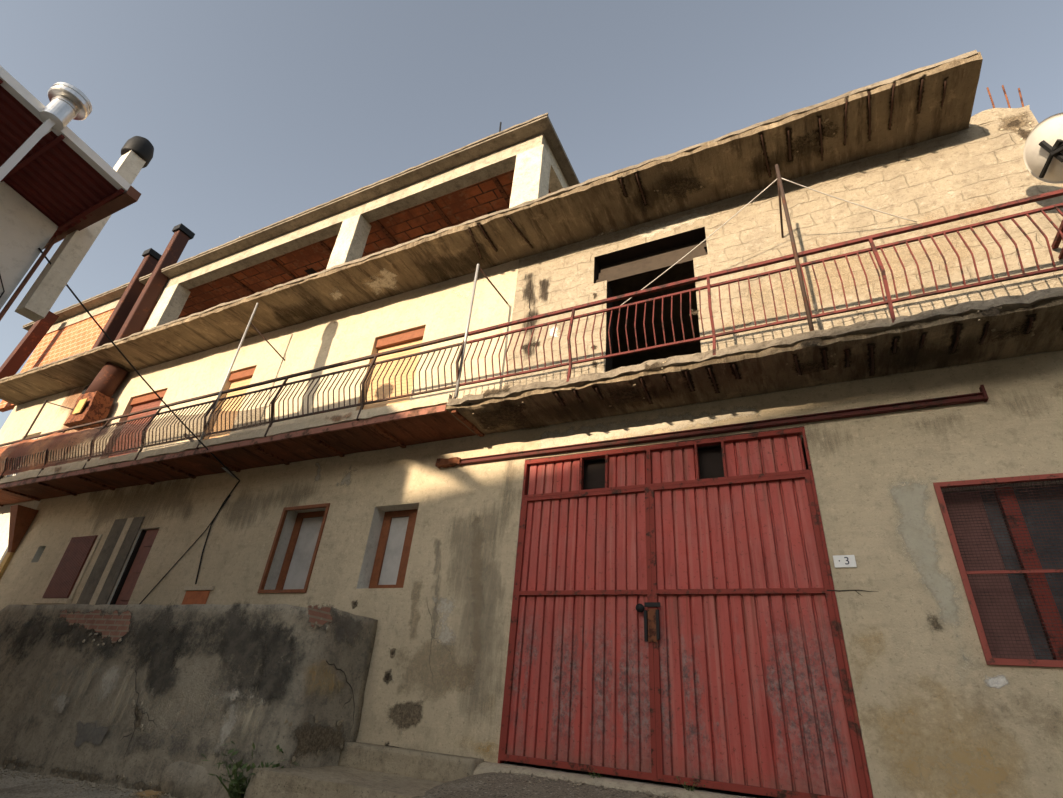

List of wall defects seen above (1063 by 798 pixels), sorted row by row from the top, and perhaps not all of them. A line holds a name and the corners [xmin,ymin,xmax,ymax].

leakage [523,273,549,356]
flaking render [60,609,132,646]
flaking render [308,605,333,631]
leakage [212,623,295,747]